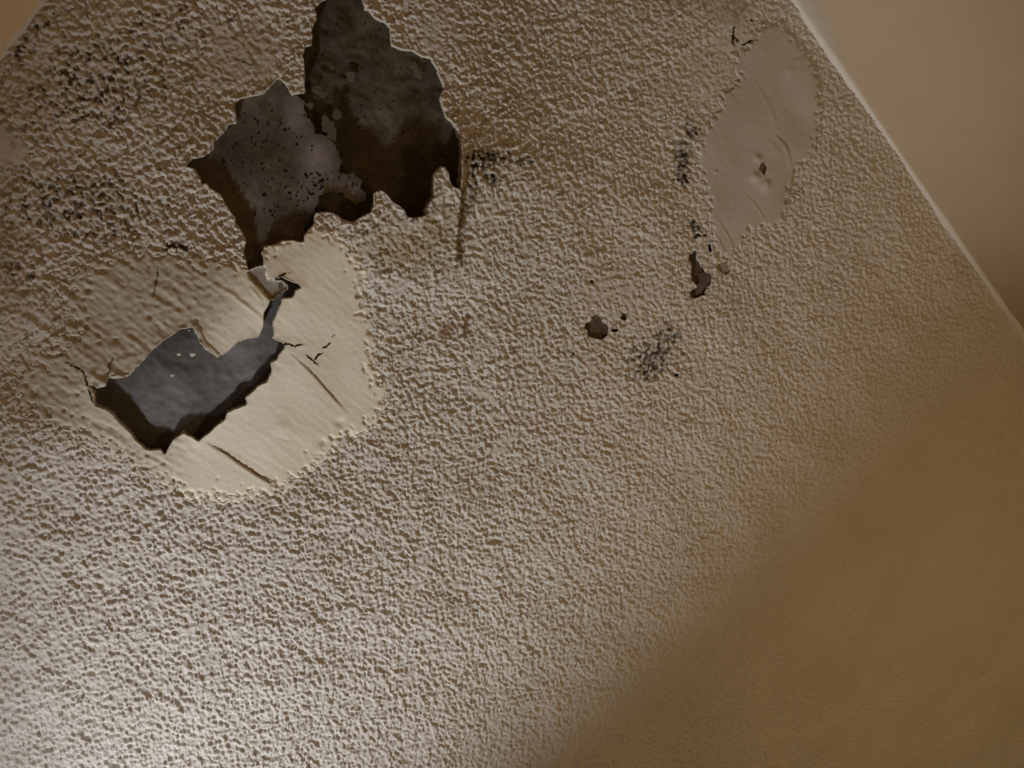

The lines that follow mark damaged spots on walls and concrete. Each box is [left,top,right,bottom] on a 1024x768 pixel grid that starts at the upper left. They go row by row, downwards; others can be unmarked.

peeling [88,0,464,456]
peeling [688,243,730,299]
peeling [583,312,627,340]
crack [284,335,343,408]
crack [207,442,277,485]